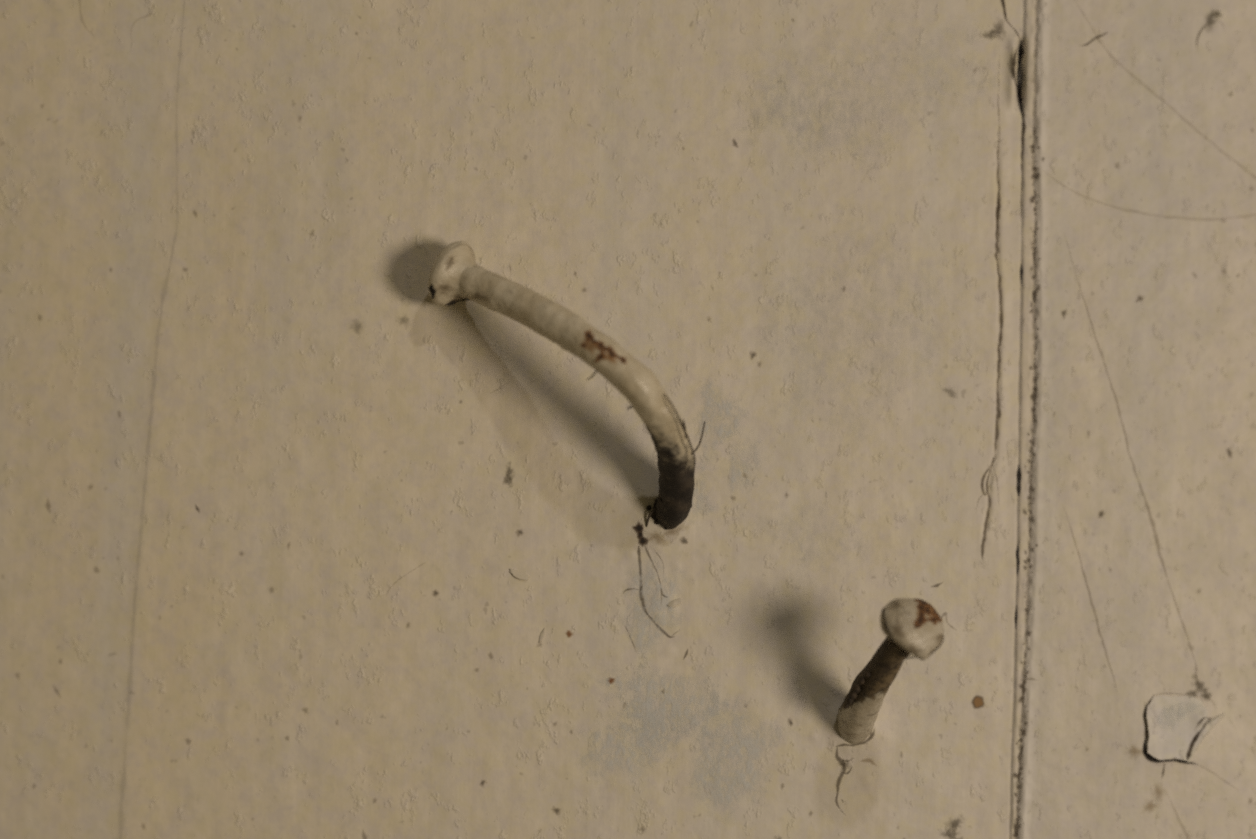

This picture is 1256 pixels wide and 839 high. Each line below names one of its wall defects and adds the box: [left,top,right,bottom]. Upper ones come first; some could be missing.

crack [978,0,1026,558]
corrosion [581,330,627,364]
crack [1014,545,1022,576]
corrosion [914,598,942,628]
peeling [1143,681,1226,778]